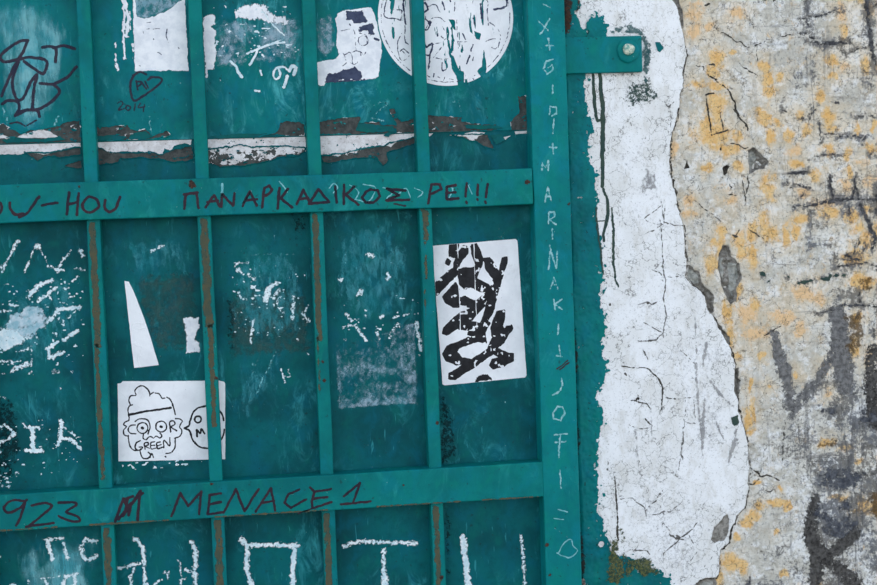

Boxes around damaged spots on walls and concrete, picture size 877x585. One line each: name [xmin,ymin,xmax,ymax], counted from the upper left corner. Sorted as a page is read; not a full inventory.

peeling [0,119,83,169]
peeling [97,124,195,166]
peeling [208,119,306,168]
peeling [320,107,415,166]
peeling [428,94,527,151]
flaking render [748,147,769,175]
corrosion [89,222,105,480]
corrosion [200,218,218,427]
corrosion [312,213,326,390]
crack [621,46,786,585]
flaking render [687,245,742,314]
flaking render [711,515,729,543]